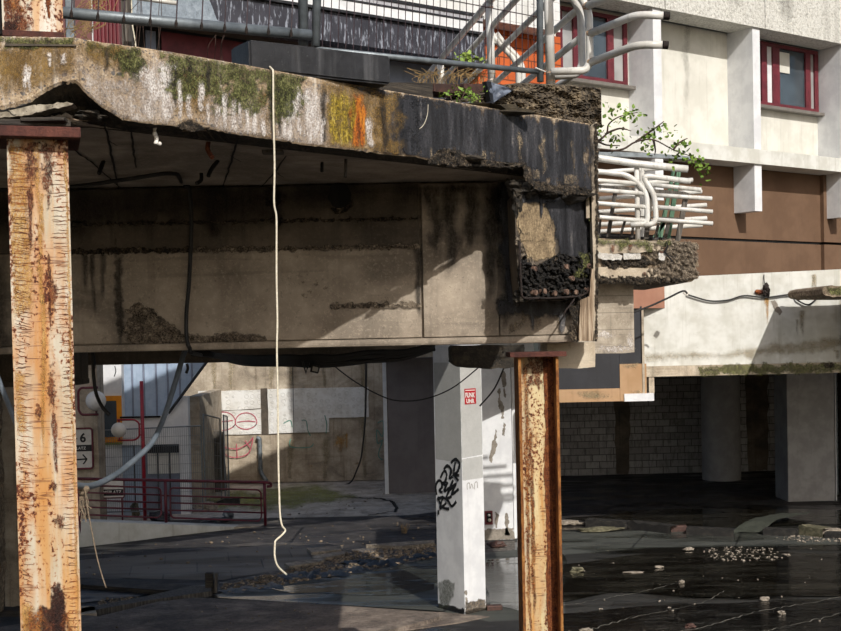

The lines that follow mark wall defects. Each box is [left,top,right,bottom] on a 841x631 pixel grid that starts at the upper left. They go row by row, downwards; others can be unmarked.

rust [3,0,33,30]
leakage [0,46,73,92]
leakage [0,199,9,228]
spalling [71,243,422,344]
leakage [70,63,601,263]
leakage [424,181,571,333]
spalling [428,148,699,342]
rust [9,141,79,631]
rust [523,357,558,631]